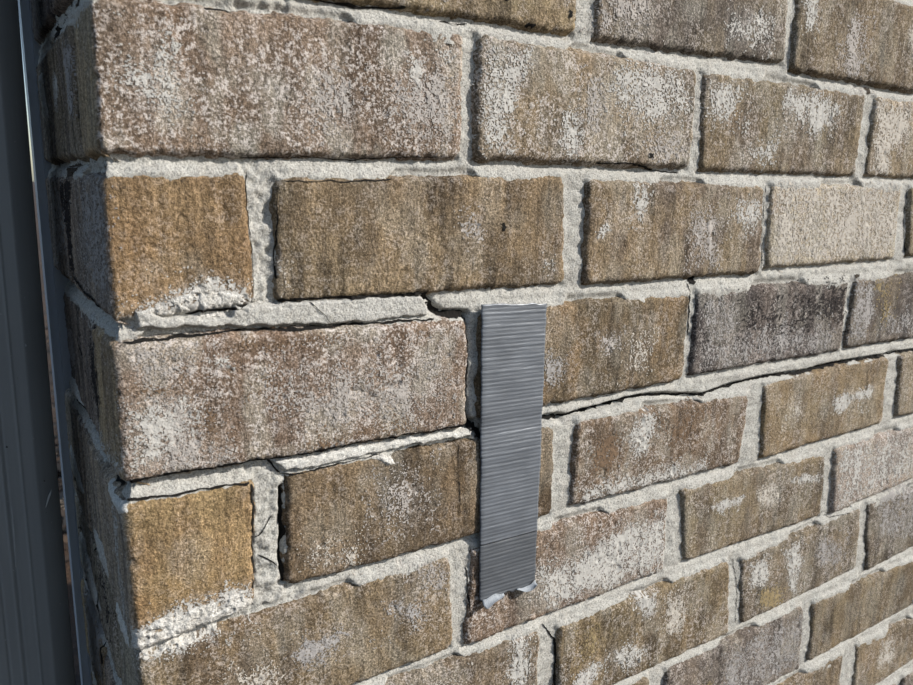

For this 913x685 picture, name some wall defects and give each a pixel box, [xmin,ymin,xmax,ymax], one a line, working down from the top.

crack [73,276,101,309]
crack [115,156,480,588]
crack [542,348,913,420]
crack [528,624,557,685]